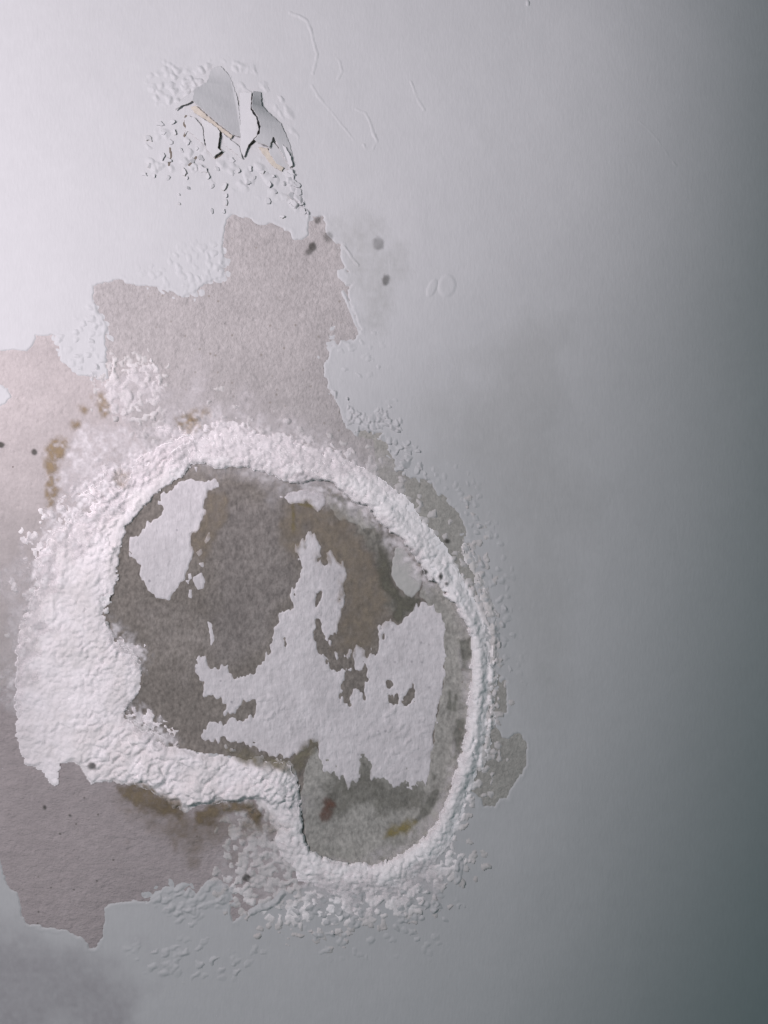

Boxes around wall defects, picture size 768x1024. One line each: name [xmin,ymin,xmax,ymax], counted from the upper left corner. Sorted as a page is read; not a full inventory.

flaking render [0,56,477,948]
damp [0,348,515,953]
flaking render [471,674,527,806]